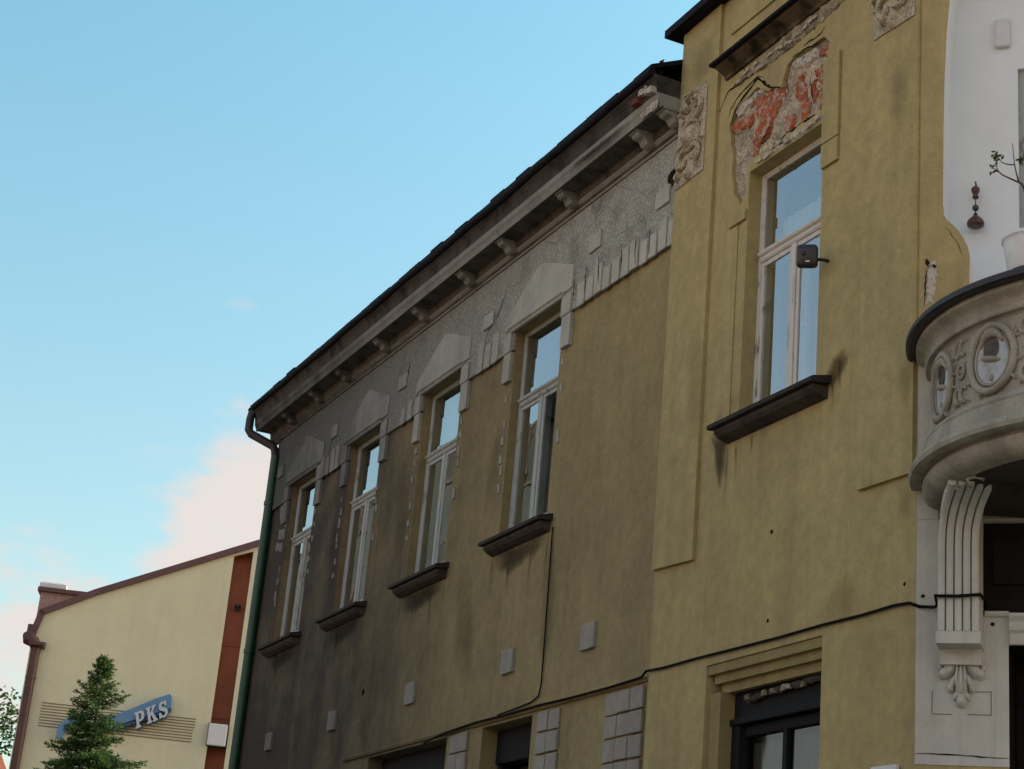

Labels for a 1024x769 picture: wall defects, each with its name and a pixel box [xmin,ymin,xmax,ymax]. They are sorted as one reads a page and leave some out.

crack [719,68,764,114]
spalling [731,15,830,200]
spalling [744,675,821,704]